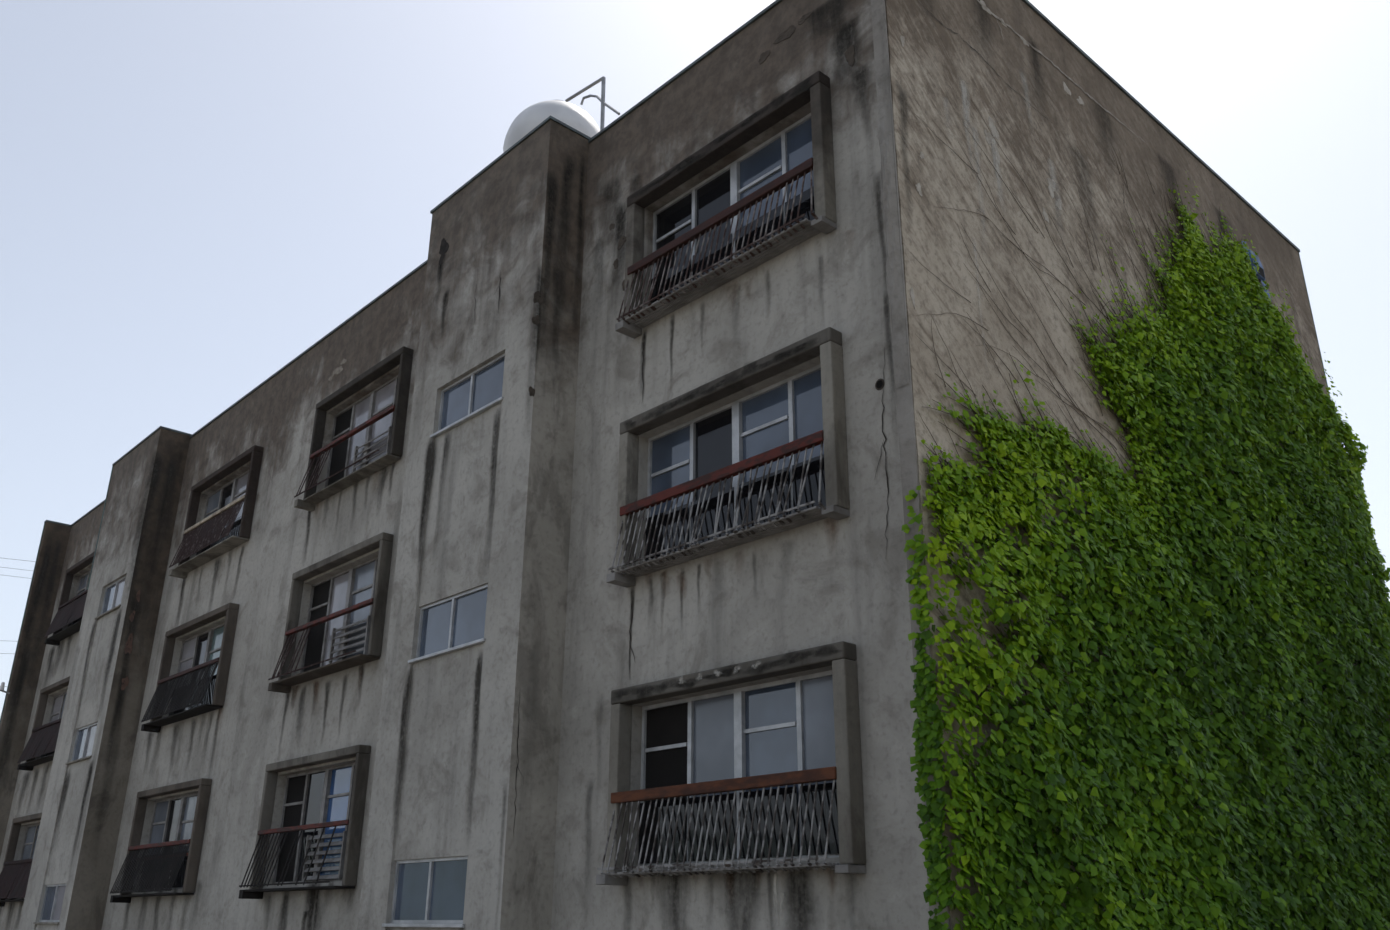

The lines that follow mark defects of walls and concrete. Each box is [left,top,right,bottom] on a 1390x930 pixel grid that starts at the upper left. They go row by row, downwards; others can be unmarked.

crack [917,0,1135,134]
leakage [534,164,584,356]
leakage [132,456,181,579]
leakage [104,601,139,721]
leakage [773,869,811,930]